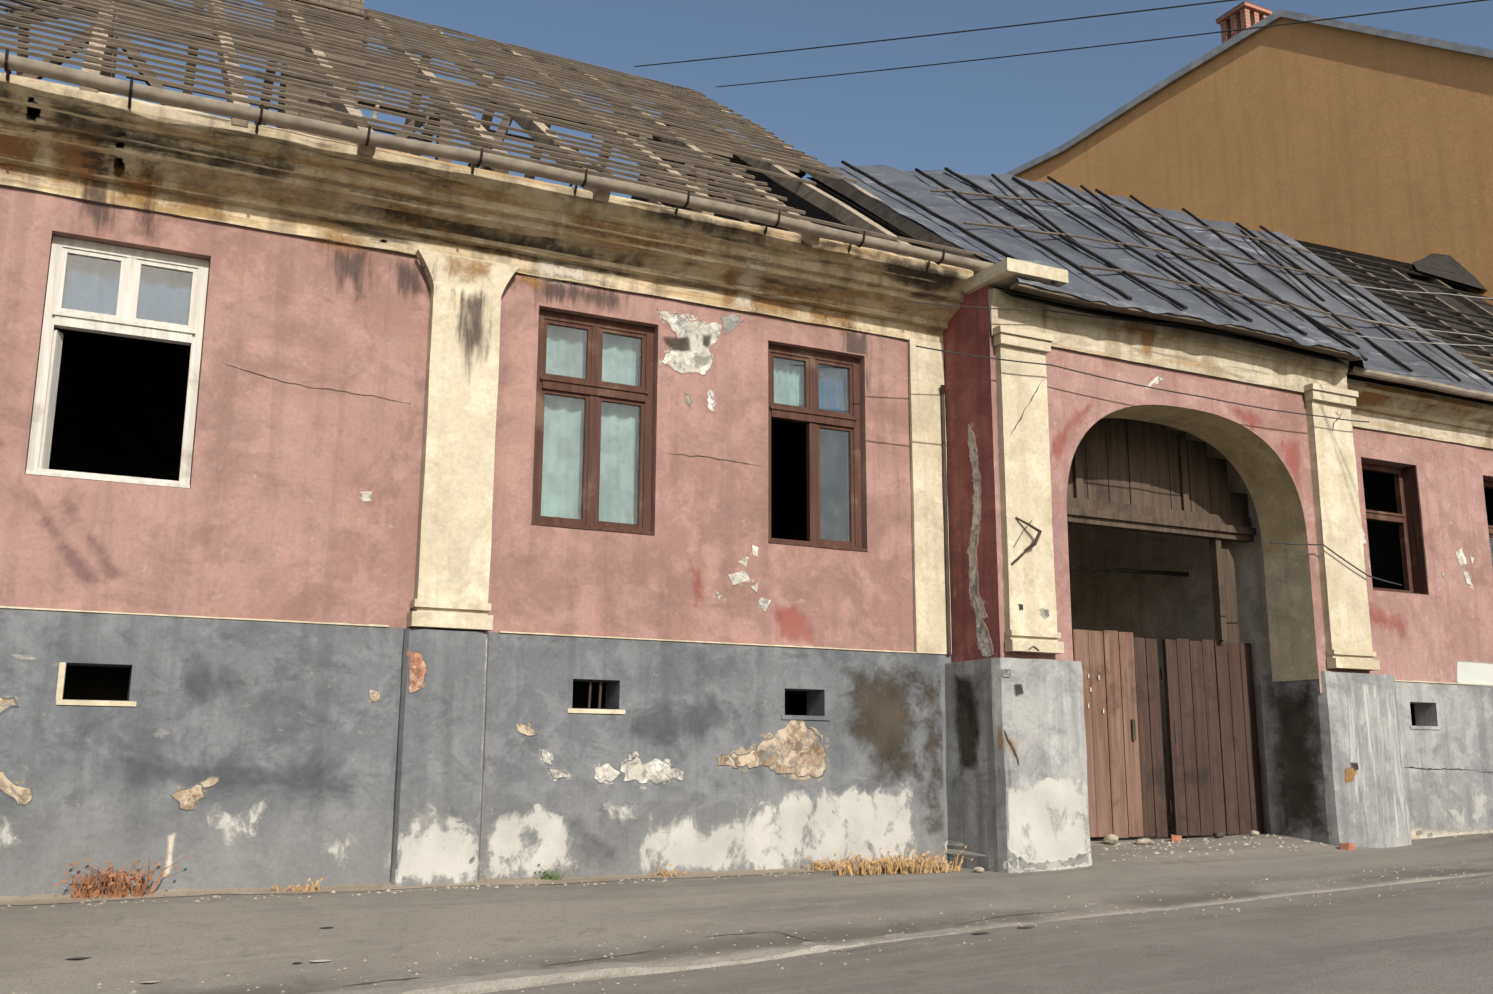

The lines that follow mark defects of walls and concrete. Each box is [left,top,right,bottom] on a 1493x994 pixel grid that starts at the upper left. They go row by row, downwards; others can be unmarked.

leakage [58,110,292,235]
leakage [374,196,642,307]
leakage [650,209,767,307]
flaking render [657,309,745,413]
spalling [715,544,771,612]
spalling [0,770,33,806]
spalling [170,776,219,811]
leakage [207,801,265,844]
leakage [388,803,572,885]
spalling [593,751,685,790]
spalling [715,720,829,783]
leakage [604,670,979,873]